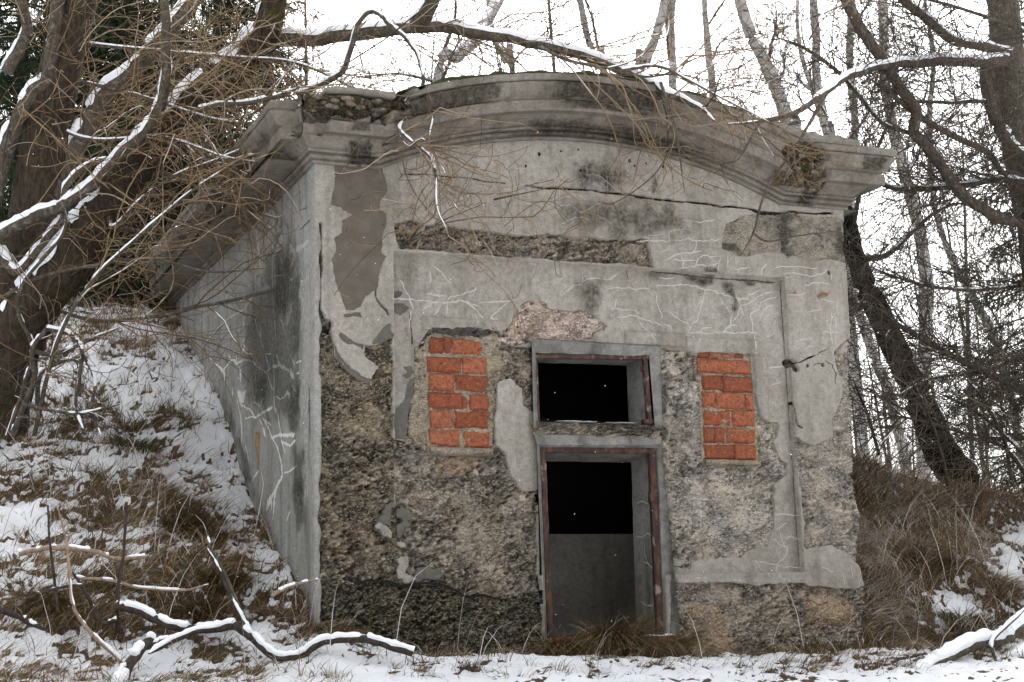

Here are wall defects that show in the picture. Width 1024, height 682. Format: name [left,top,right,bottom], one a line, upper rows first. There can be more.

crack [188,284,302,521]
leakage [232,231,313,523]
crack [384,266,515,343]
spalling [318,291,605,655]
peeling [331,166,651,318]
crack [531,186,853,583]
spalling [653,339,860,569]
spalling [722,212,845,275]
spalling [670,581,865,657]